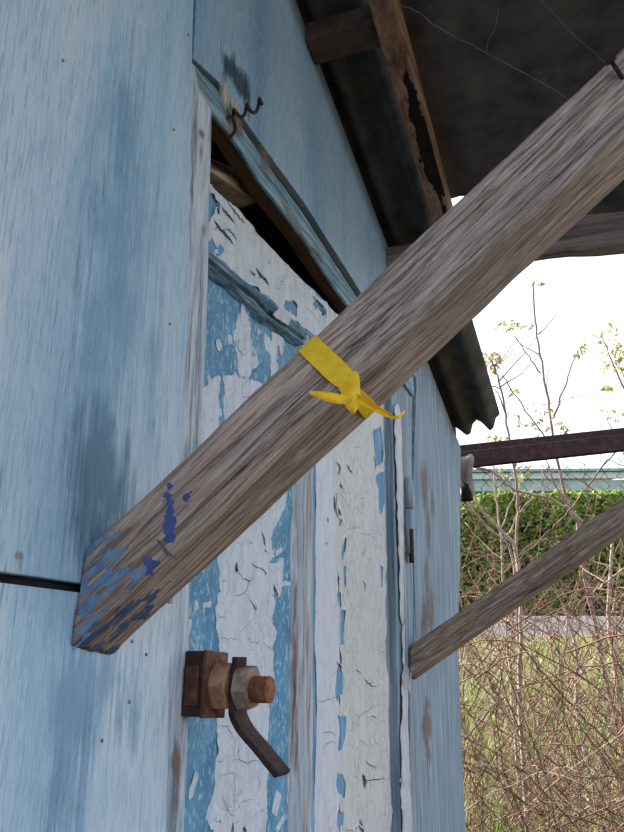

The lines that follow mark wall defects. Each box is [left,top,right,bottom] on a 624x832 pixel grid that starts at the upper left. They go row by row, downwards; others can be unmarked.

peeling [209,184,338,336]
peeling [200,304,285,444]
peeling [189,492,291,679]
crack [223,531,279,610]
peeling [314,403,413,832]
peeling [188,772,199,801]
crack [216,726,264,832]
peeling [205,709,288,832]
peeling [247,703,270,741]
crack [320,657,390,788]